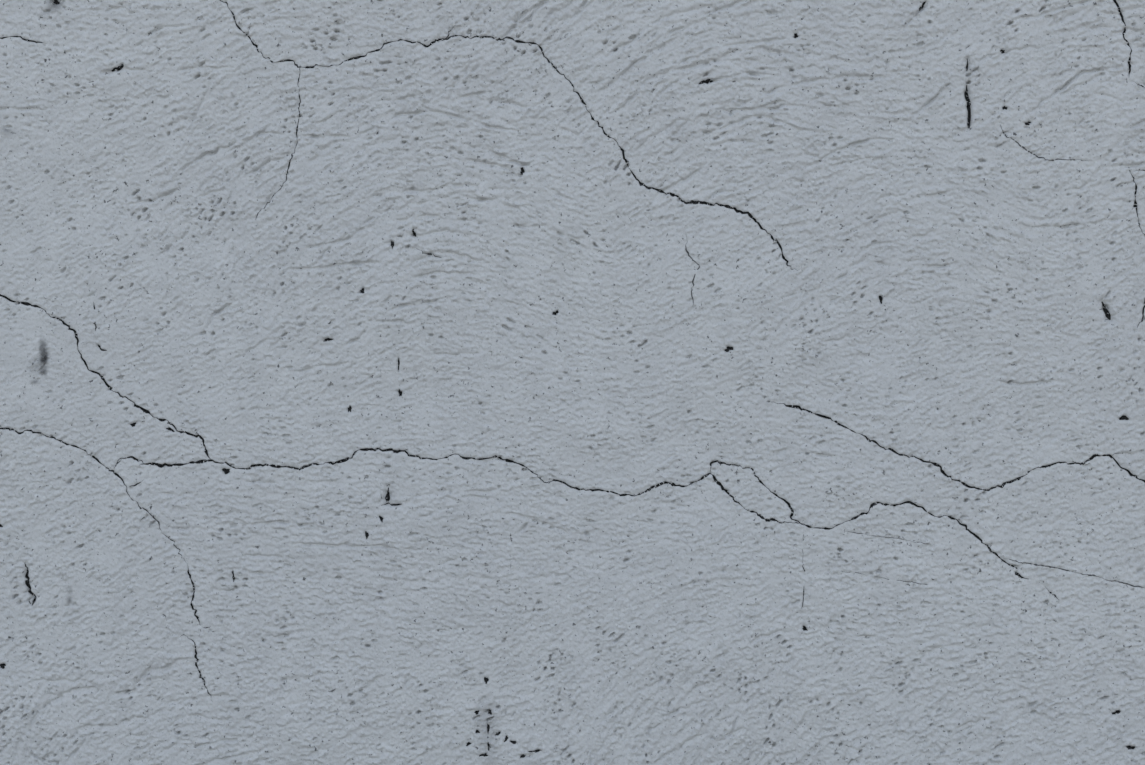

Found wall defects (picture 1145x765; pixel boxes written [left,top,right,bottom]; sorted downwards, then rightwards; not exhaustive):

crack [0,36,47,44]
crack [1113,0,1145,88]
crack [220,0,798,271]
crack [1000,125,1089,161]
crack [1129,170,1145,235]
crack [685,236,700,304]
crack [0,294,1145,695]